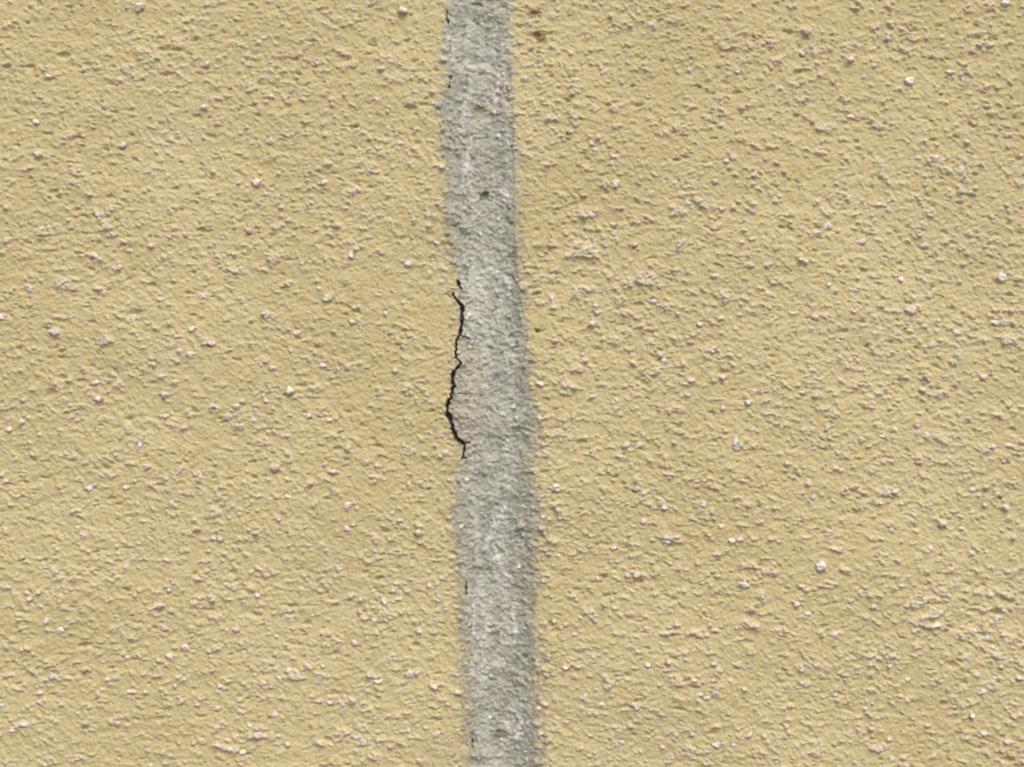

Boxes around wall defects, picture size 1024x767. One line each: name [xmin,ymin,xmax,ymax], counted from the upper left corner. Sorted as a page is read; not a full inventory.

crack [446,281,482,459]